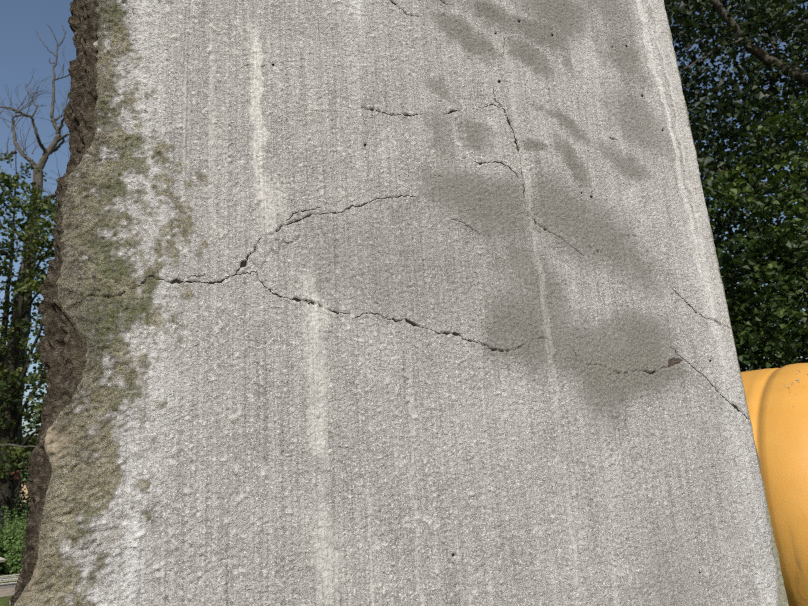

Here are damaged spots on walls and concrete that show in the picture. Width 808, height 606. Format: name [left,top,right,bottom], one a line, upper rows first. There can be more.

crack [362,106,423,117]
crack [475,89,584,256]
spalling [9,0,100,606]
crack [72,195,547,353]
crack [646,347,749,420]